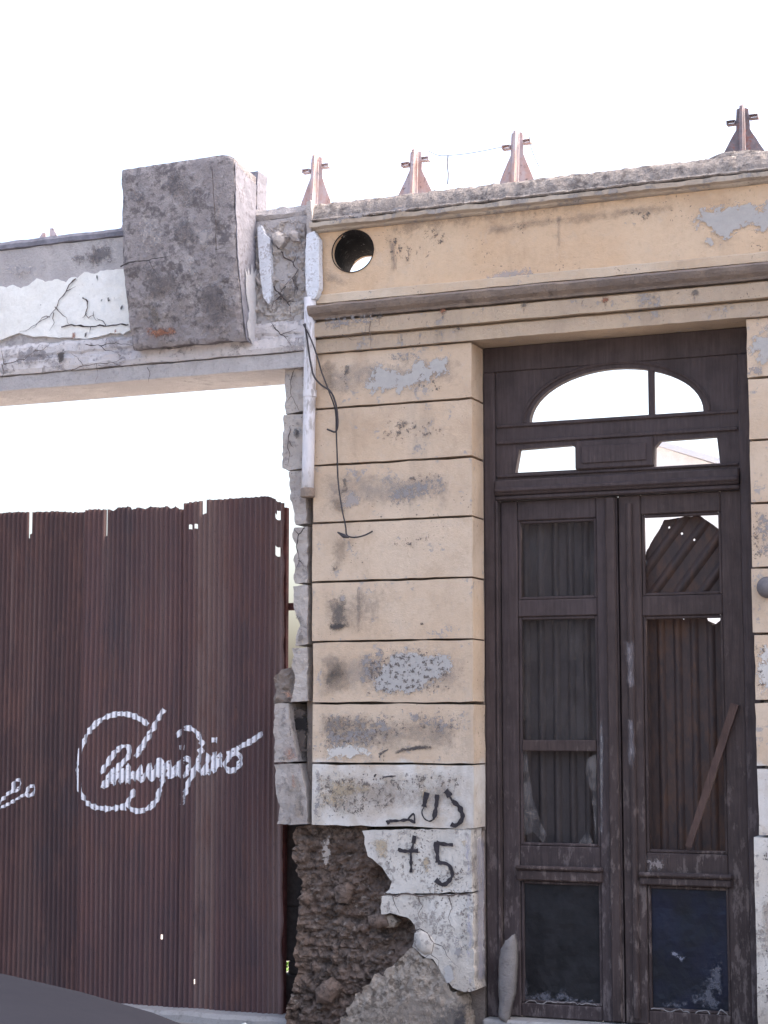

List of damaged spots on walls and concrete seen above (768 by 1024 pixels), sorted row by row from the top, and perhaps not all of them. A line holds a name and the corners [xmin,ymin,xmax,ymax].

peeling [691,200,768,246]
crack [1,278,150,382]
peeling [364,352,450,396]
peeling [360,646,453,696]
spalling [285,771,475,1024]
crack [380,879,471,971]